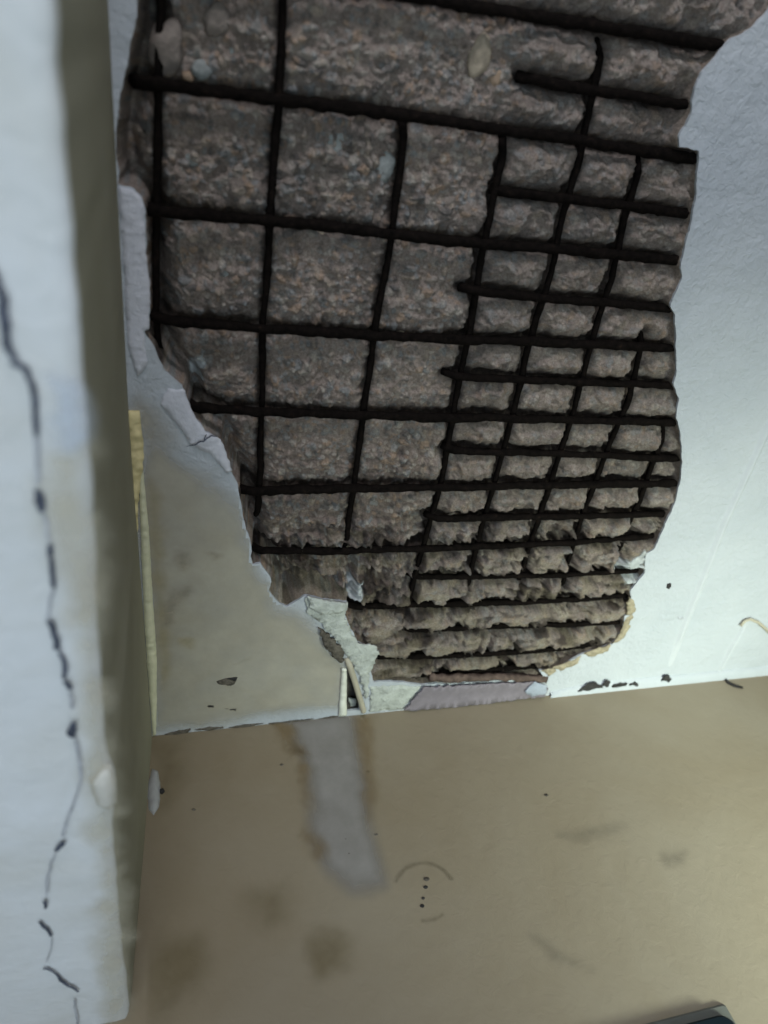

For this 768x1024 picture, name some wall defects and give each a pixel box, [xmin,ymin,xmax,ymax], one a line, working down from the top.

crack [0,280,83,1024]
spalling [116,0,768,735]